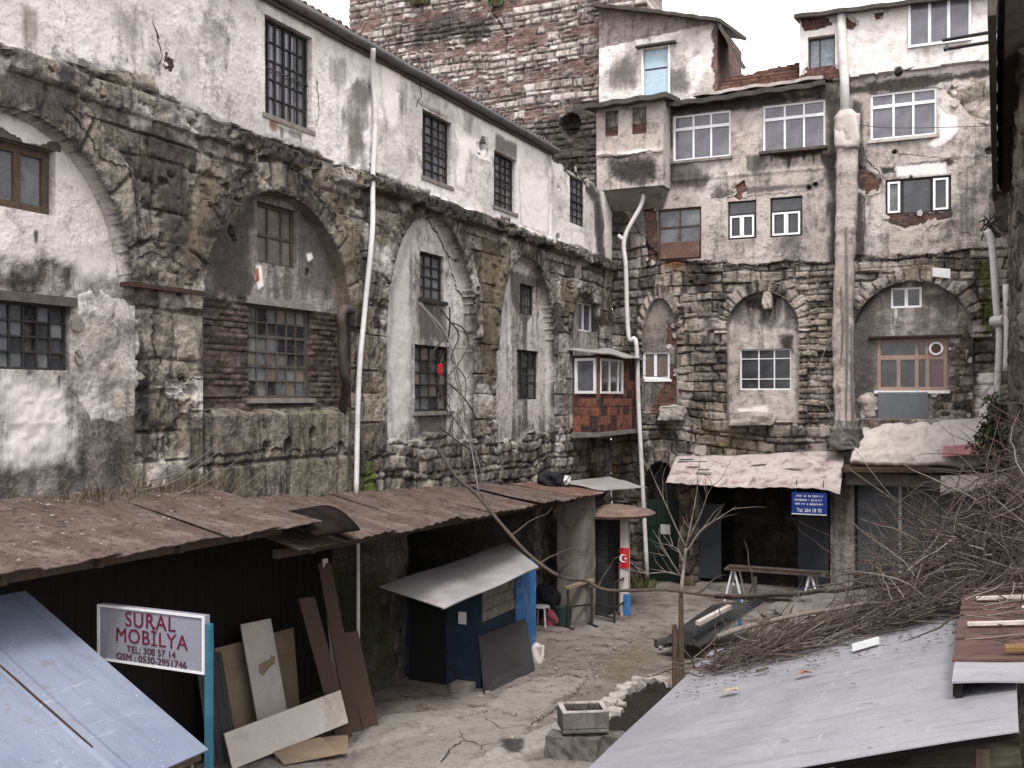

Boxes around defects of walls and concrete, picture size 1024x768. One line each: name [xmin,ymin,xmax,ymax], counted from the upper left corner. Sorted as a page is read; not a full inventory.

crack [153,23,169,75]
spalling [800,65,852,84]
damp [344,79,371,162]
damp [534,99,656,261]
spalling [732,180,747,200]
spalling [858,168,882,195]
spalling [883,210,953,229]
damp [74,248,108,287]
peeling [70,283,145,422]